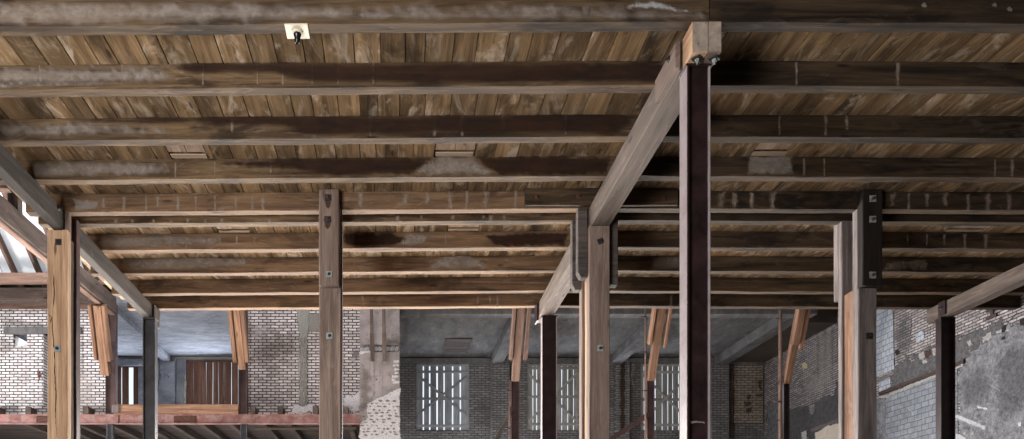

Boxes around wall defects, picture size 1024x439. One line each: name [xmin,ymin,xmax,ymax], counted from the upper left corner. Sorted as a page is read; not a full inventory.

water stain [344,233,403,246]
water stain [488,234,567,247]
peeling [967,318,1024,346]
peeling [918,347,936,364]
peeling [351,344,401,439]
spalling [880,375,936,398]